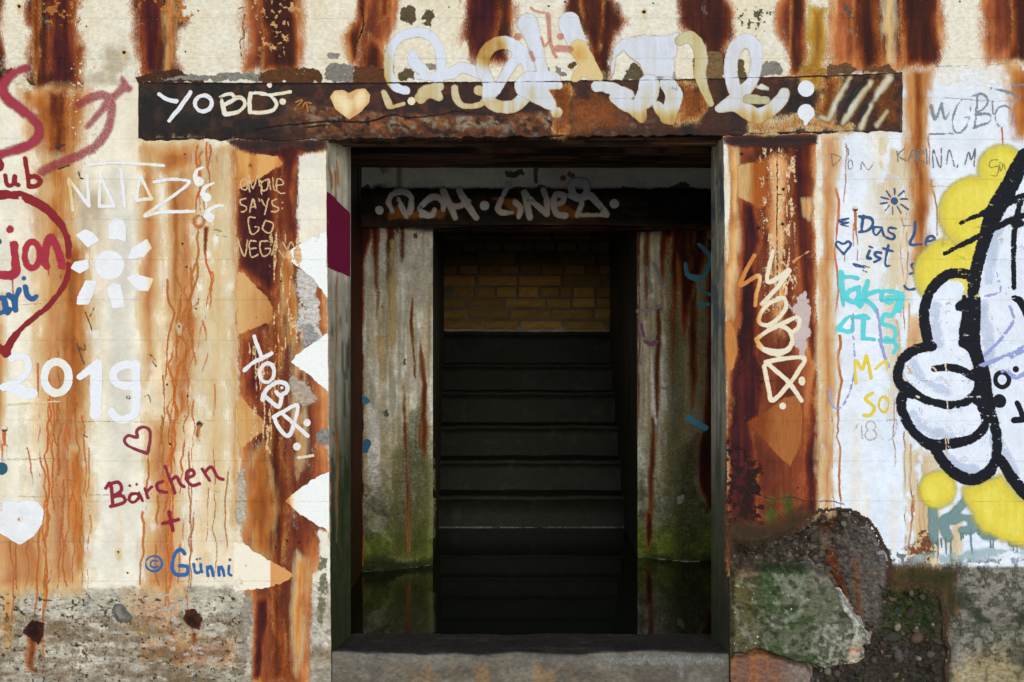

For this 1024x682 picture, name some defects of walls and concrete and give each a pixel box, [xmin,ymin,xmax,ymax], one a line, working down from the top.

corrosion [122,0,189,76]
corrosion [239,0,306,73]
corrosion [341,0,400,71]
corrosion [460,0,519,66]
corrosion [564,0,627,82]
corrosion [677,0,736,65]
corrosion [979,0,1024,145]
corrosion [0,0,96,674]
corrosion [138,140,339,682]
corrosion [362,201,464,565]
corrosion [637,230,711,547]
corrosion [724,0,962,568]